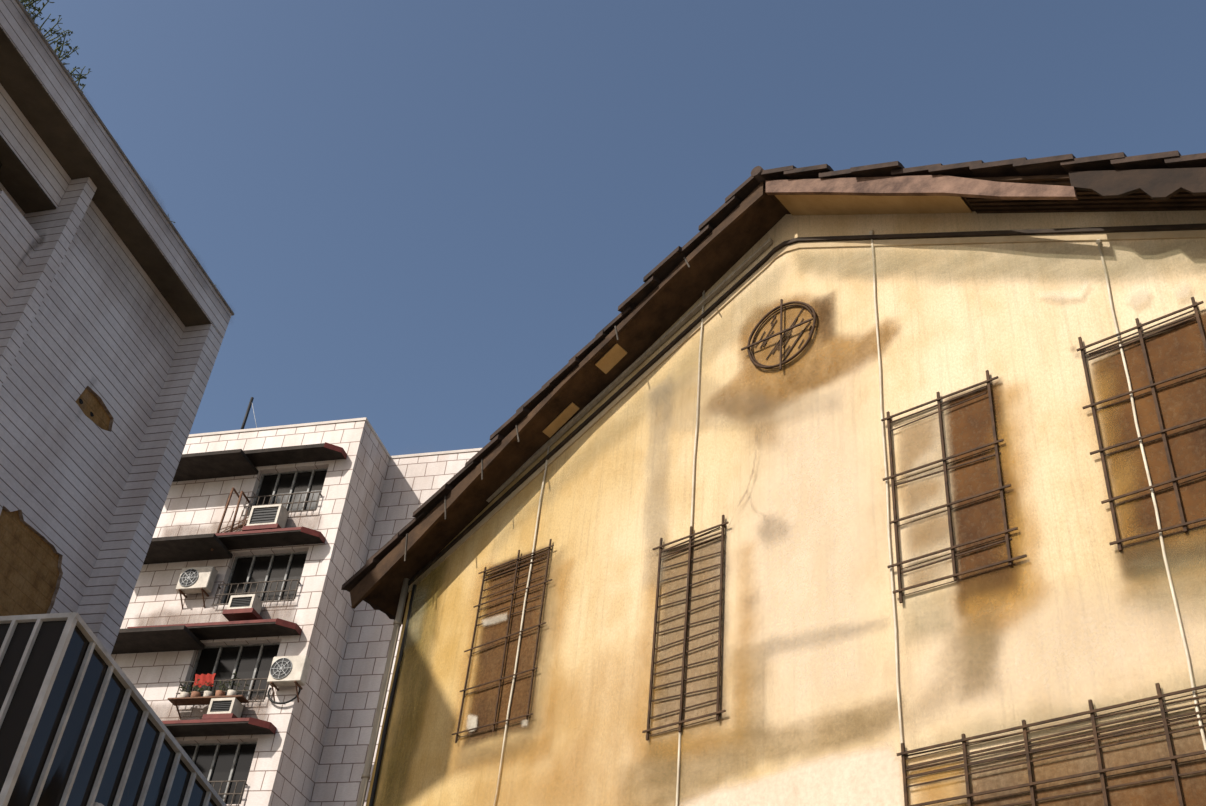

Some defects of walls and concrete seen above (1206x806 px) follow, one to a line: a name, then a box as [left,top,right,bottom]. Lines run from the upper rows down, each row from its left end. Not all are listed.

spalling [75,386,114,432]
spalling [0,506,63,616]